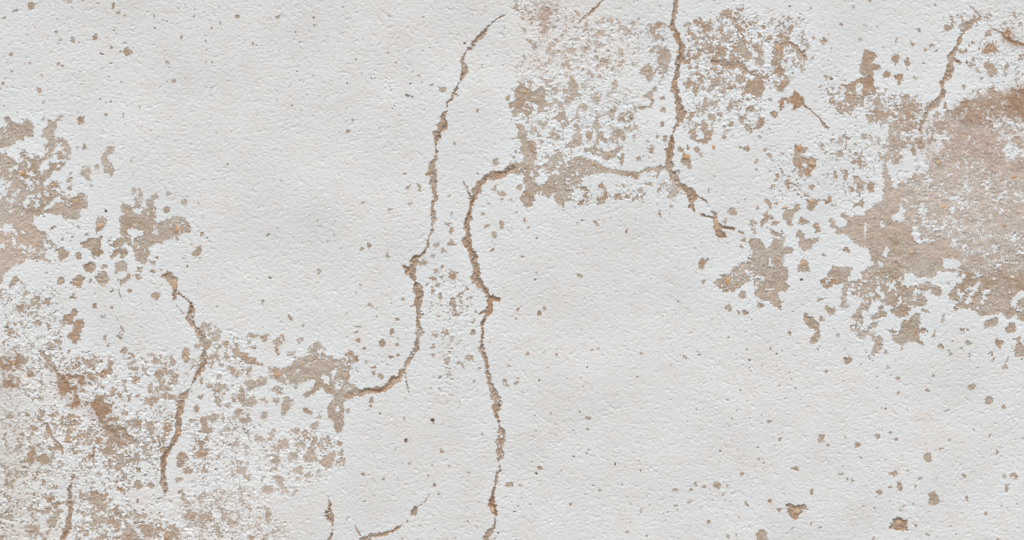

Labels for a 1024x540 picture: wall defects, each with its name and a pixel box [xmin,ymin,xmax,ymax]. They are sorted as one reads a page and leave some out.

crack [160,271,210,497]
peeling [0,113,384,540]
crack [346,15,503,399]
peeling [419,212,477,390]
crack [461,165,517,540]
crack [579,0,604,23]
crack [664,0,745,239]
peeling [481,0,1024,370]
crack [919,6,1024,133]